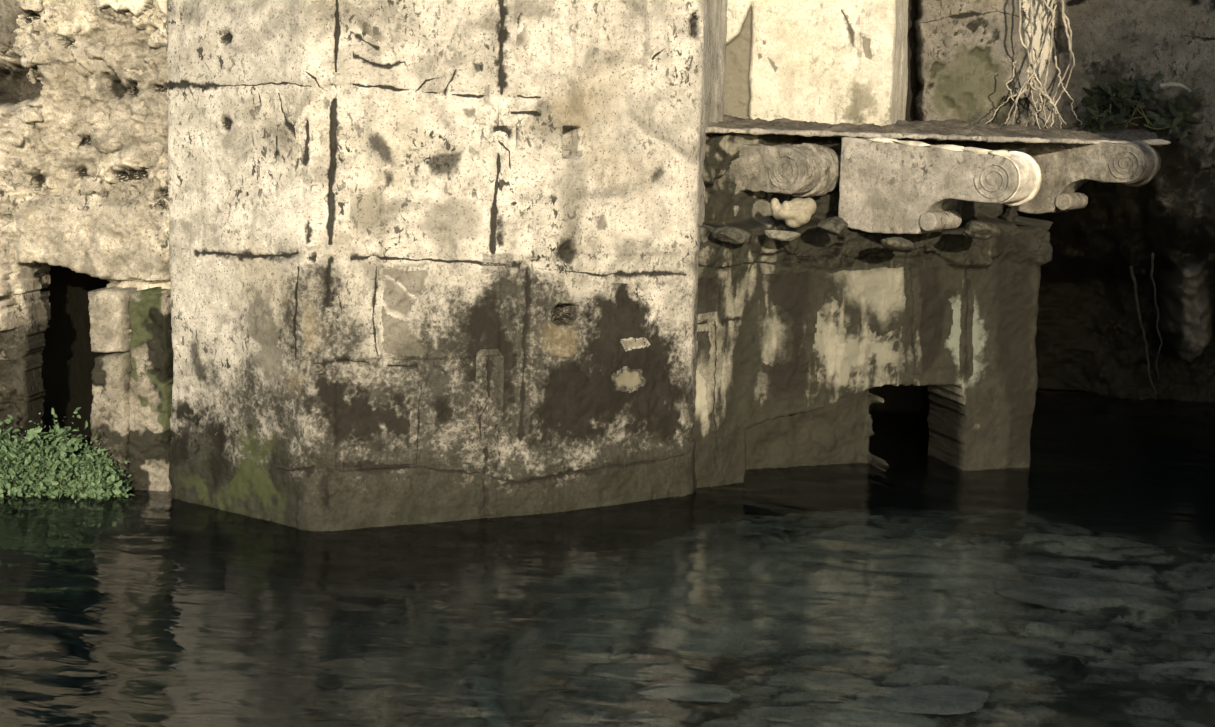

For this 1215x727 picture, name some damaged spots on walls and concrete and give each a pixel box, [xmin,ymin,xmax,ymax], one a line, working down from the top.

spalling [15,10,42,26]
spalling [0,52,51,113]
spalling [94,72,169,105]
spalling [19,167,47,192]
spalling [67,131,93,183]
spalling [106,164,169,213]
water stain [185,334,210,386]
water stain [232,270,337,415]
water stain [533,307,582,377]
water stain [695,245,953,429]
water stain [982,222,1047,469]
water stain [169,410,240,497]